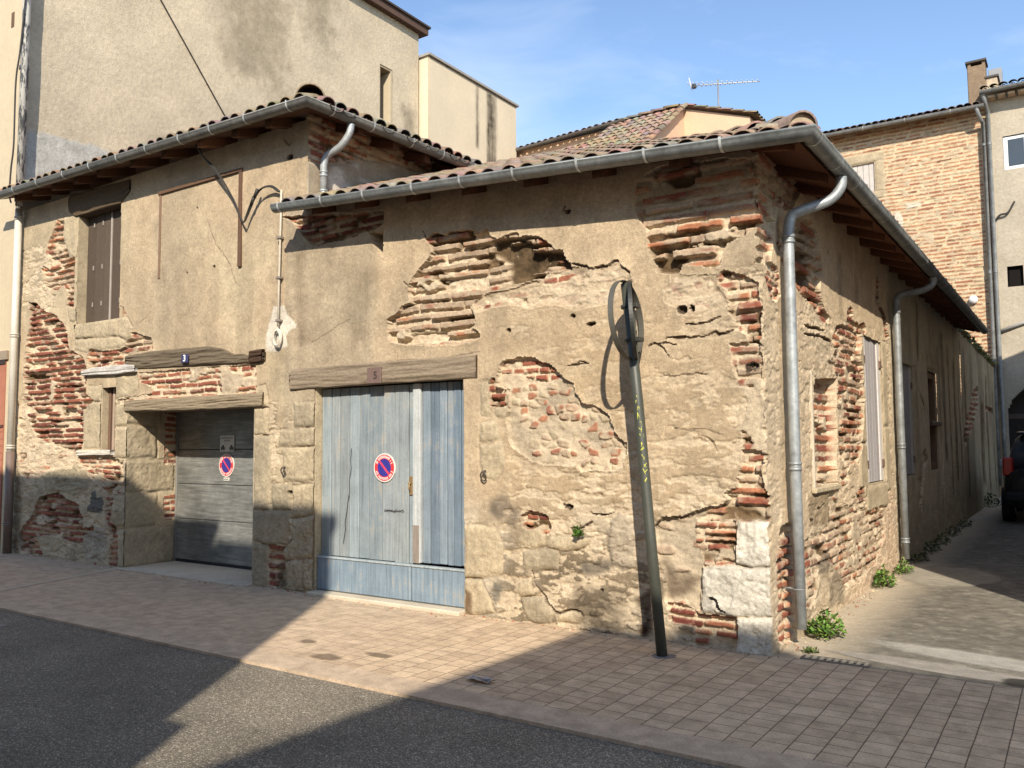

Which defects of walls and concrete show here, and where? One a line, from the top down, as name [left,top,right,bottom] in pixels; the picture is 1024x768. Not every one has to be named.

leakage [477,94,495,162]
spalling [282,209,384,247]
spalling [386,228,634,347]
crack [647,315,734,378]
spalling [16,219,153,566]
spalling [116,364,258,405]
peeling [488,356,627,473]
spalling [633,153,886,650]
spalling [520,510,552,535]
crack [655,506,716,528]
crack [531,570,585,618]